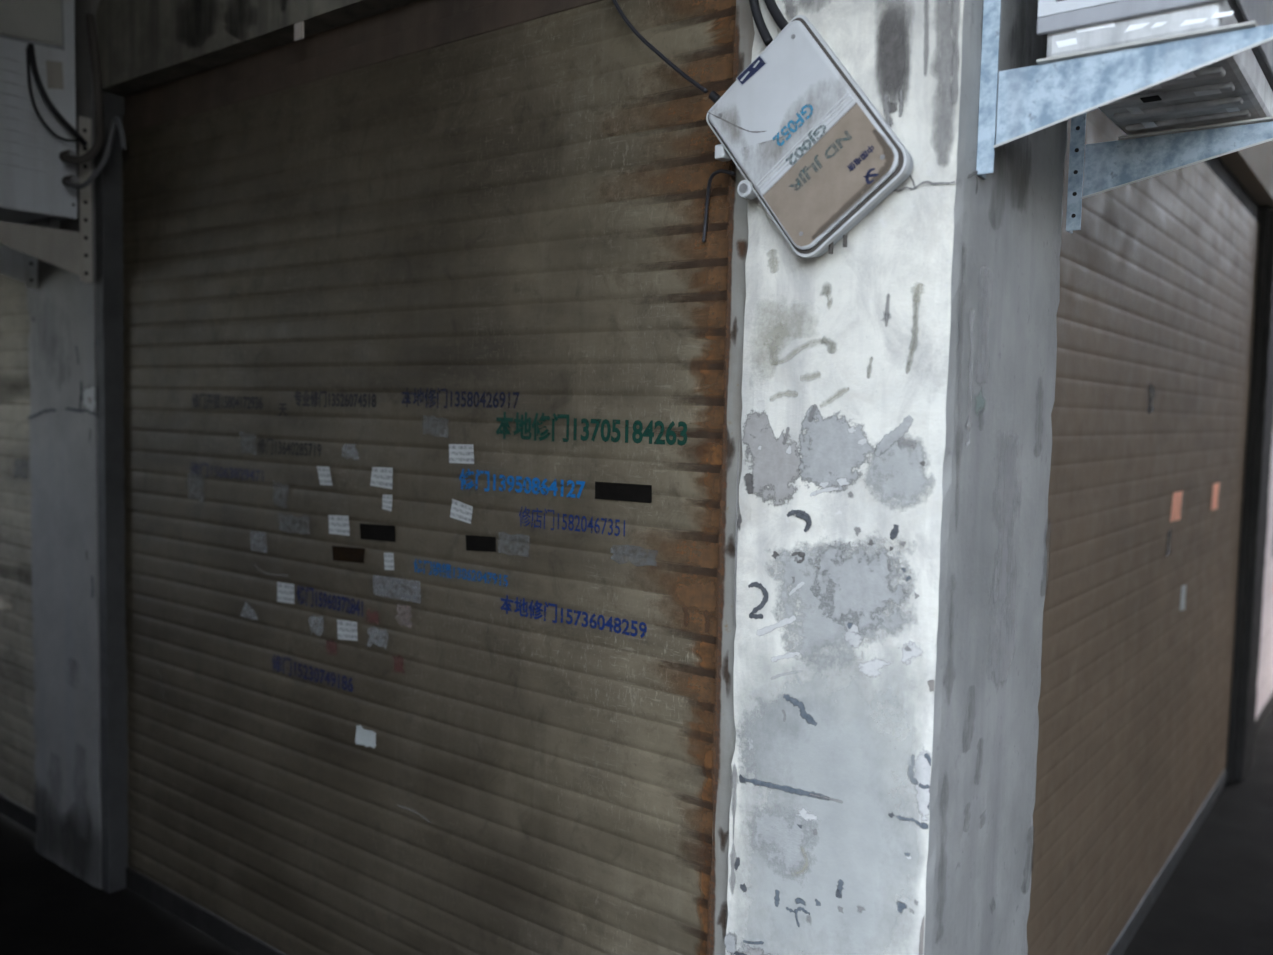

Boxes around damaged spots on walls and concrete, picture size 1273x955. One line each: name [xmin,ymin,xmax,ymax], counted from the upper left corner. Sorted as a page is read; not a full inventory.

leakage [878,0,959,164]
rust [636,0,747,955]
peeling [735,404,934,624]
crack [739,774,842,803]
peeling [724,524,936,955]
crack [734,940,764,955]
crack [786,907,810,927]